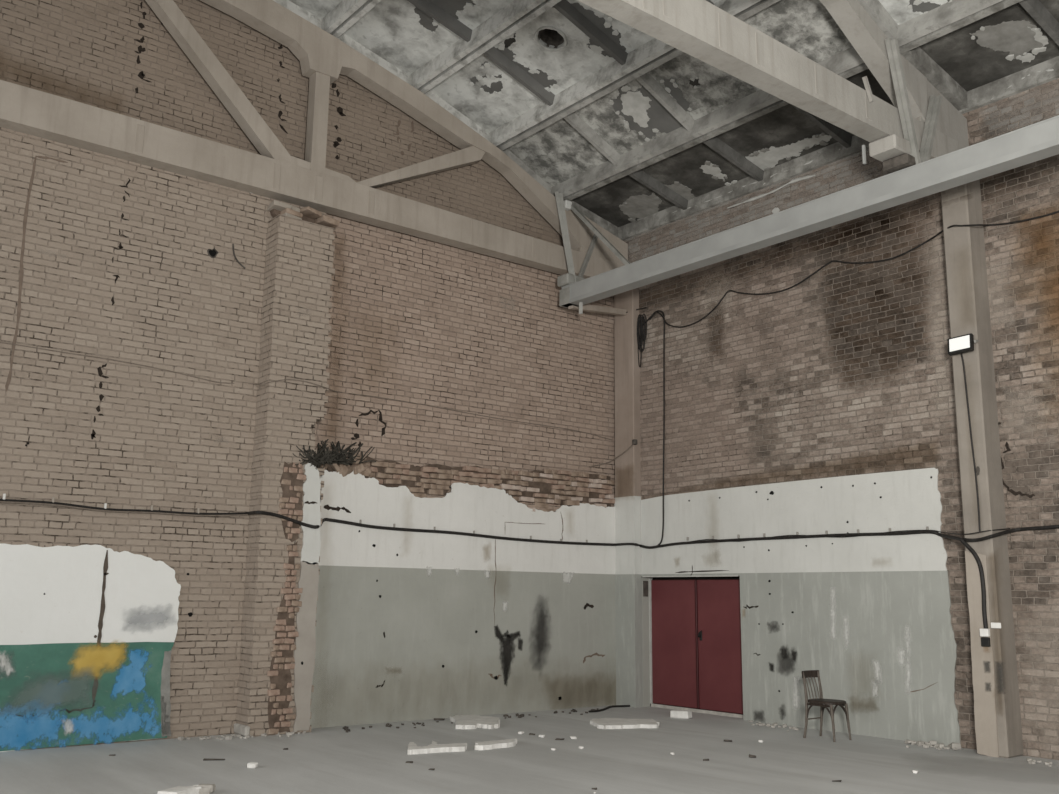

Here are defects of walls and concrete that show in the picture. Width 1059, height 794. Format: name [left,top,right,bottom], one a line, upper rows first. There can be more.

crack [134,2,163,93]
peeling [414,0,476,34]
peeling [496,33,559,92]
crack [332,74,346,159]
peeling [608,77,700,142]
peeling [665,132,840,212]
crack [111,178,131,305]
crack [91,364,109,439]
crack [351,410,386,446]
spalling [327,454,615,512]
crack [94,550,109,646]
spalling [267,461,306,734]